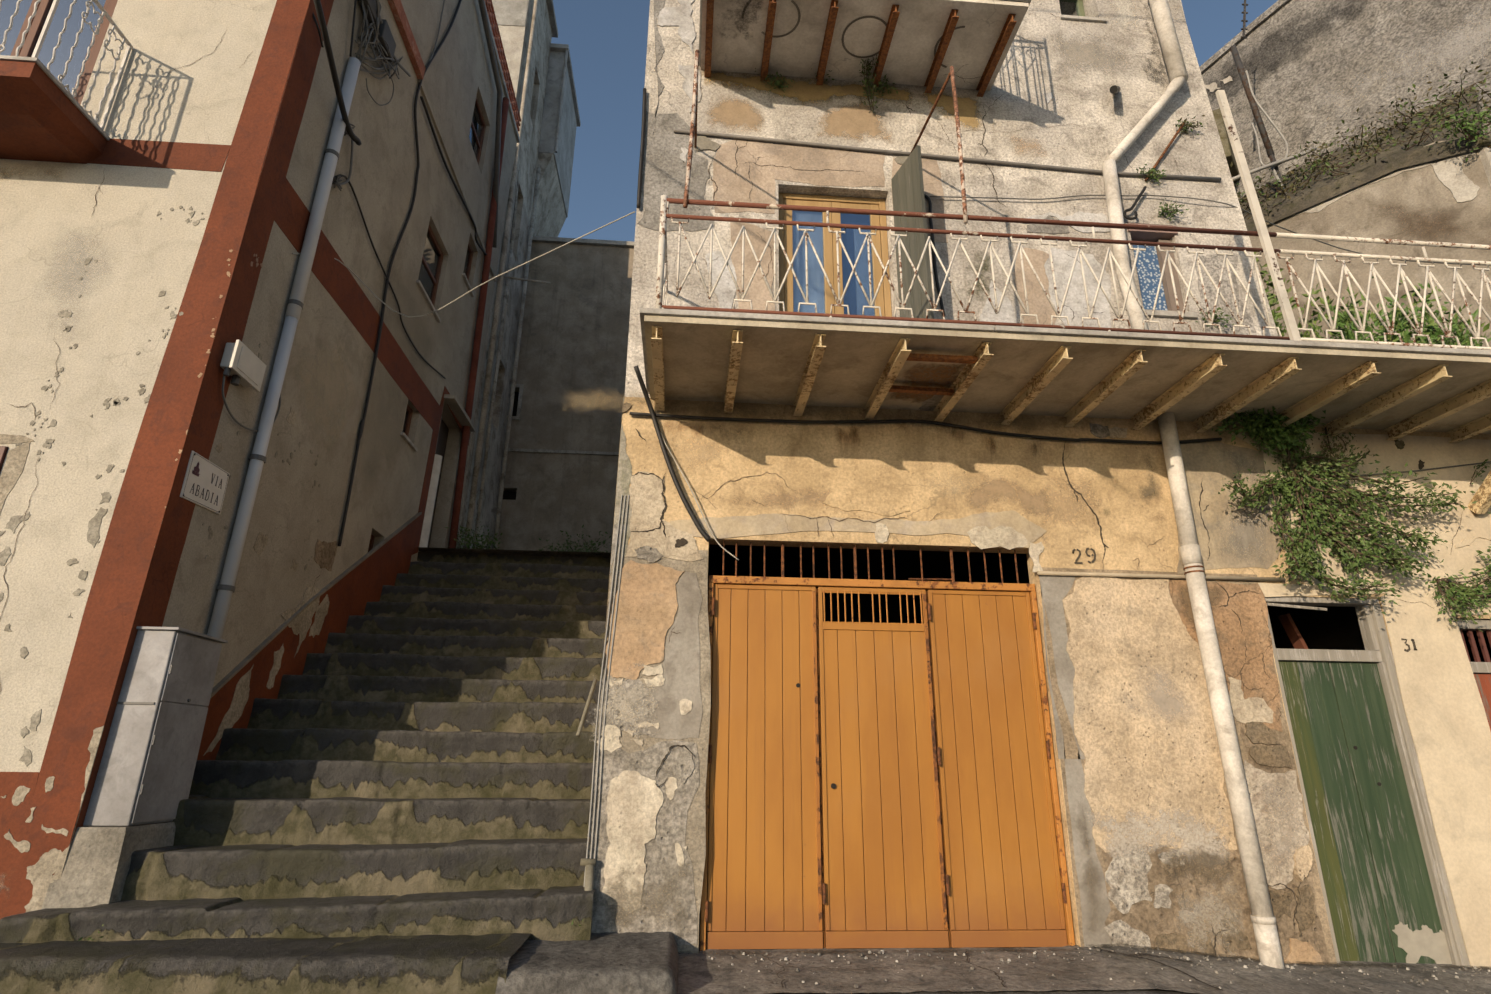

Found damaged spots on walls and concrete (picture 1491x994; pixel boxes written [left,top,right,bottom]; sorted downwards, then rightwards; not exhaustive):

flaking render [637,0,902,311]
damp [707,71,979,139]
flaking render [921,158,948,243]
flaking render [1278,146,1491,221]
crack [0,458,39,619]
spalling [0,410,57,566]
crack [631,429,940,537]
crack [1062,441,1163,570]
peeling [203,519,339,756]
flaking render [588,397,1330,965]
peeling [1,726,104,913]
peeling [1392,922,1452,964]